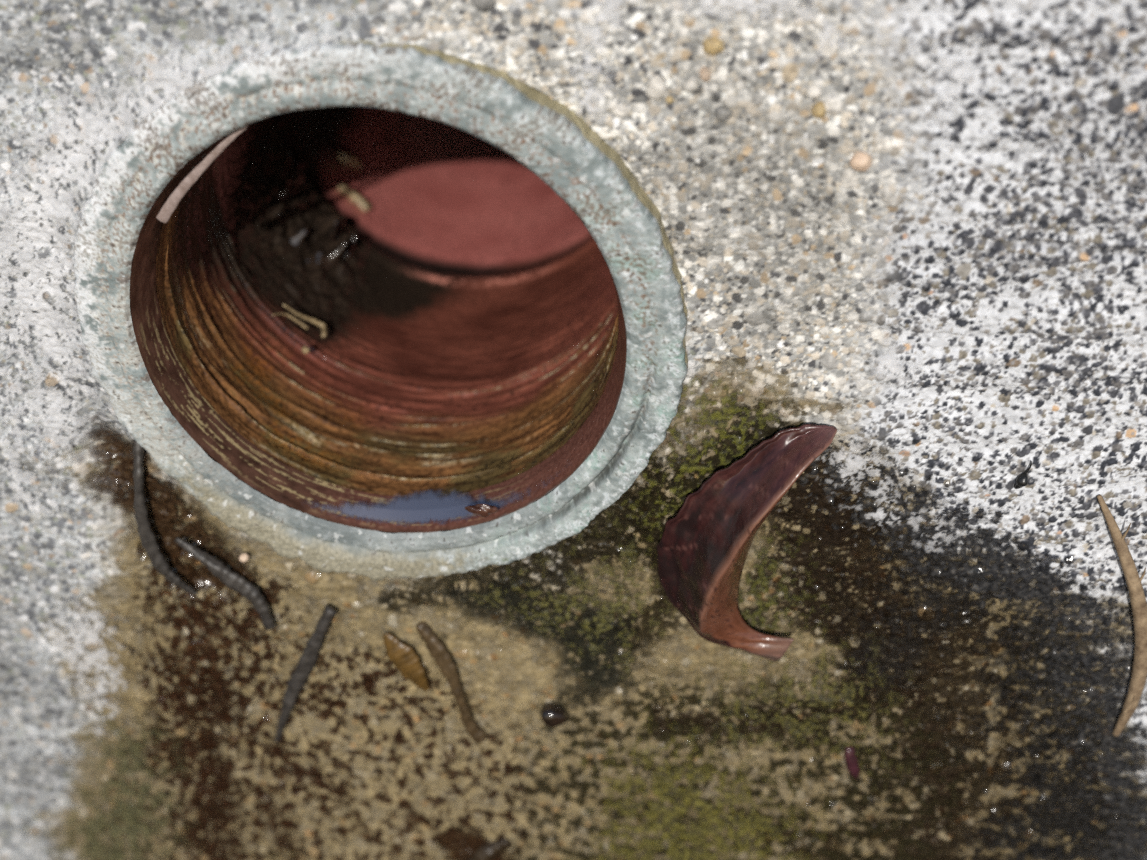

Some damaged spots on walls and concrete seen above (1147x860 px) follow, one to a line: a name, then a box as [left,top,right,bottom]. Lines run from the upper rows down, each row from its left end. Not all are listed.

water stain [37,359,1147,860]
water stain [876,350,911,380]